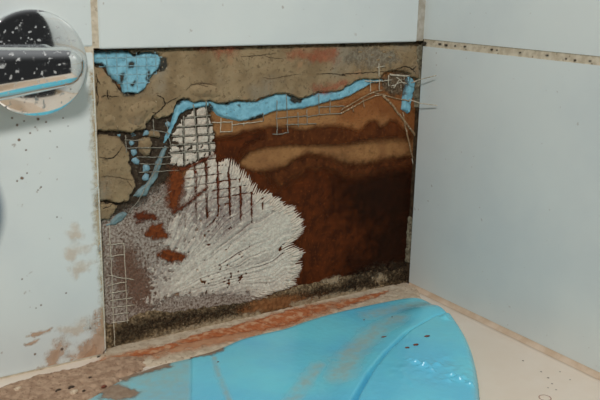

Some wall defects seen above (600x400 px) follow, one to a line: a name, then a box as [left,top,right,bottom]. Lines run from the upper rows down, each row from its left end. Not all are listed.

crack [96,74,118,106]
peeling [94,51,160,94]
spalling [381,71,410,97]
crack [99,95,176,159]
peeling [129,130,150,181]
rust [133,210,168,240]
leakage [90,65,414,349]
rust [157,249,189,263]
rust [47,291,387,366]